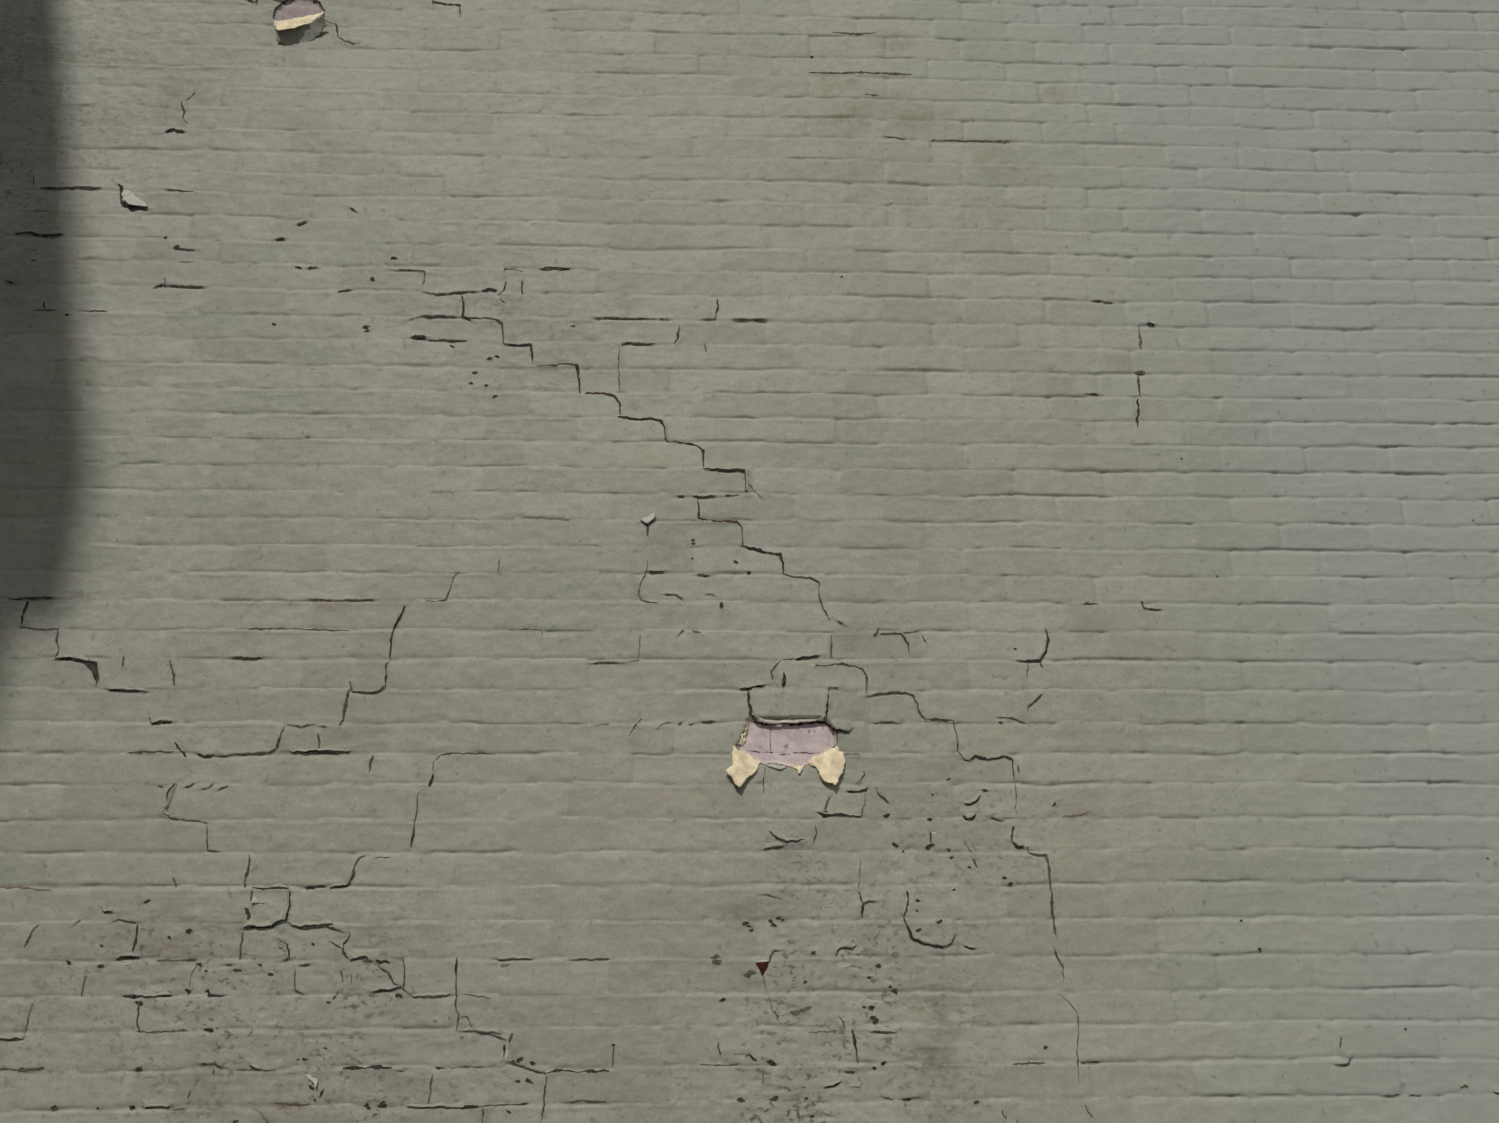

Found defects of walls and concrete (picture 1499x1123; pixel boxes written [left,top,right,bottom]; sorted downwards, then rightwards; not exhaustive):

peeling [255,0,360,46]
crack [165,91,196,133]
crack [5,175,101,212]
peeling [118,184,148,212]
crack [154,236,203,288]
crack [1093,300,1155,427]
crack [395,264,1101,1117]
peeling [726,651,859,793]
crack [0,571,615,1122]
peeling [764,825,817,850]